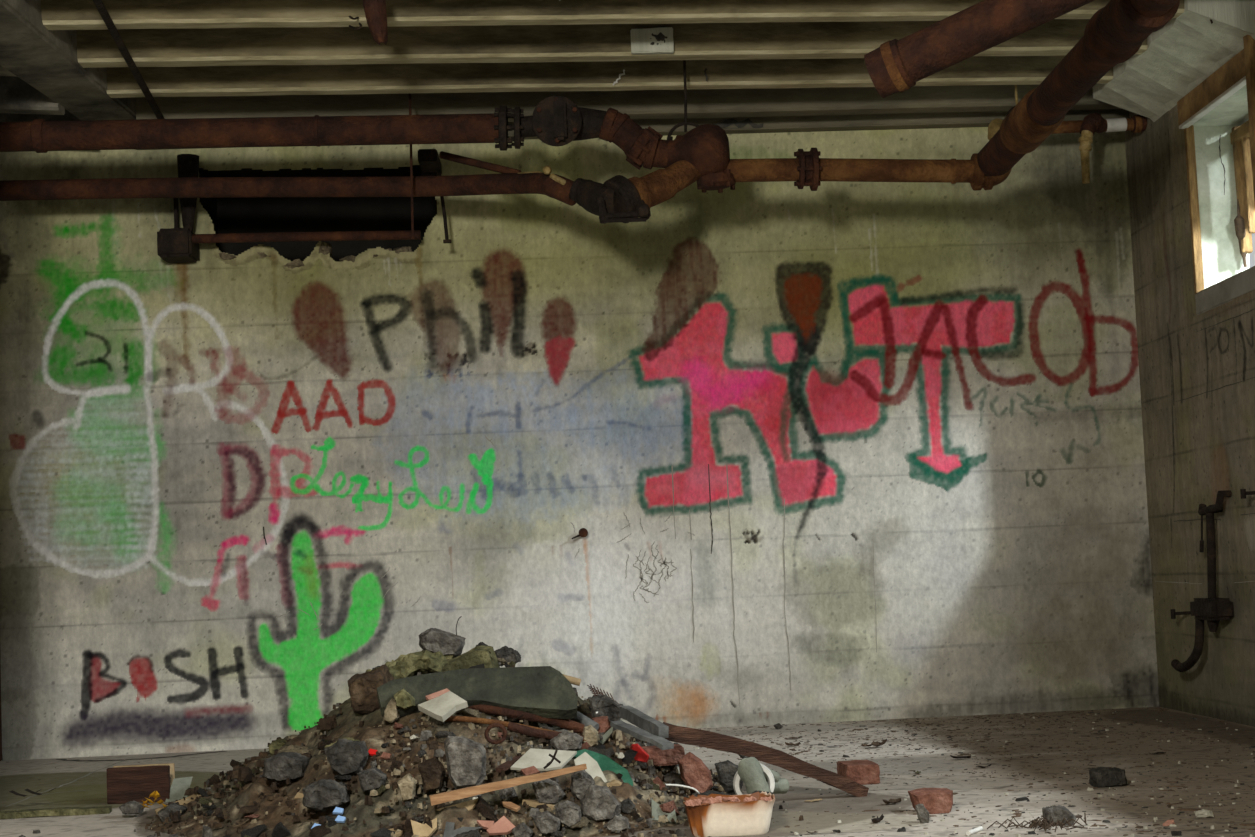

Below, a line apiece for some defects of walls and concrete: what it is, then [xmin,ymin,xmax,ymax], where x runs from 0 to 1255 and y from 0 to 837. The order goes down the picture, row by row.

spalling [208,221,416,274]